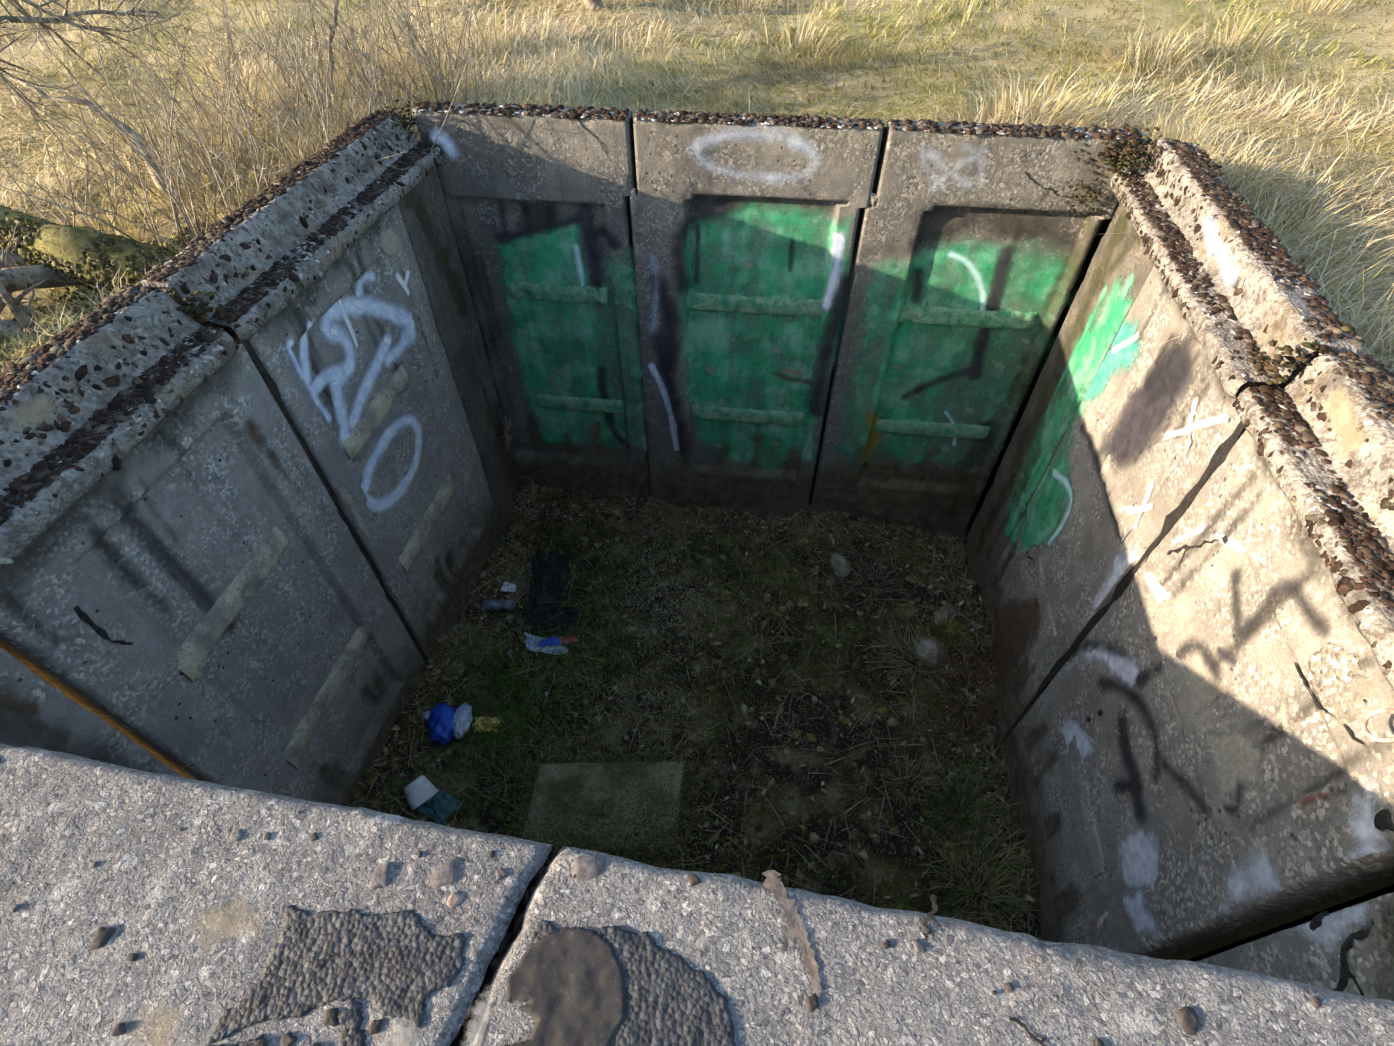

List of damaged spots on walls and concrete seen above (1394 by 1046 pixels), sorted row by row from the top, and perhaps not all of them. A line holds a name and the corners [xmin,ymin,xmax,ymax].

crack [1167,536,1223,570]
peeling [337,998,367,1046]
peeling [208,1034,265,1046]